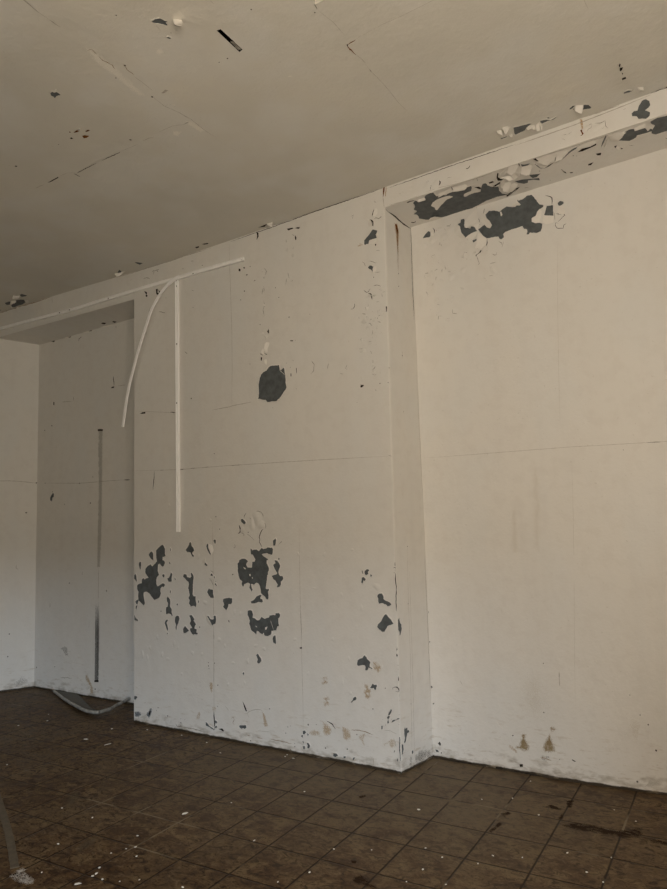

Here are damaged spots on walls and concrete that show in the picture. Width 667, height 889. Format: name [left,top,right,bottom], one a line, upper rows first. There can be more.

peeling [407,64,667,256]
peeling [134,529,233,636]
peeling [232,529,284,644]
peeling [357,654,374,672]
peeling [376,592,402,636]